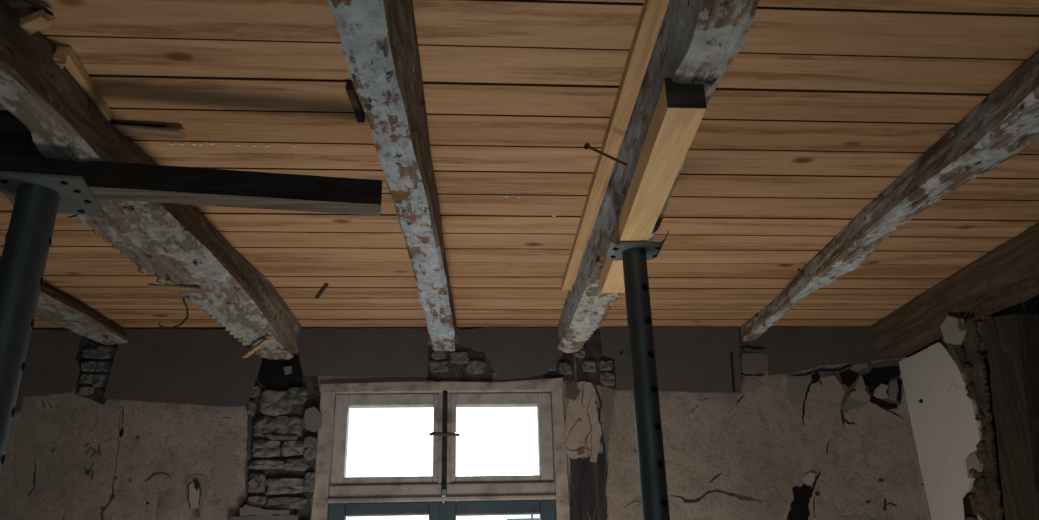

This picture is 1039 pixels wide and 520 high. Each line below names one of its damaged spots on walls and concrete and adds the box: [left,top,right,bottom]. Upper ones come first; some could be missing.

flaking render [75,336,118,405]
flaking render [543,329,617,463]
crack [740,345,765,376]
spalling [811,360,902,412]
crack [788,365,855,517]
crack [669,474,761,502]
spalling [787,472,820,520]